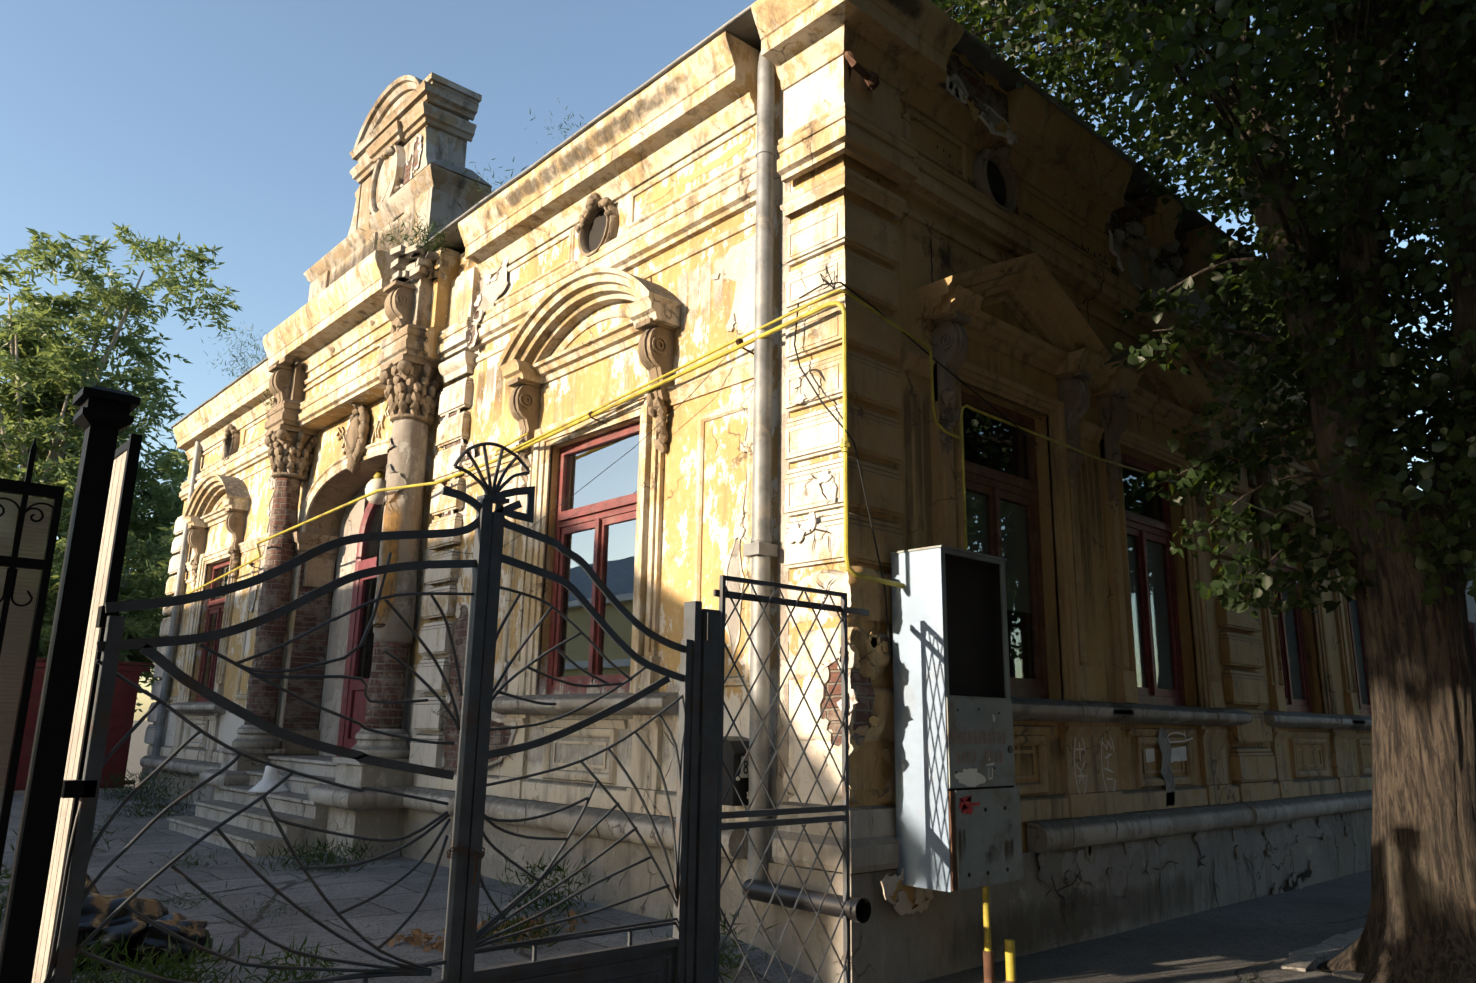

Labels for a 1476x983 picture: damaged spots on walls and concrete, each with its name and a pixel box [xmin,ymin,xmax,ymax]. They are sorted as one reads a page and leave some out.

peeling [711,233,756,351]
peeling [792,374,821,405]
peeling [725,380,754,665]
peeling [787,470,838,543]
flaking render [818,632,893,756]